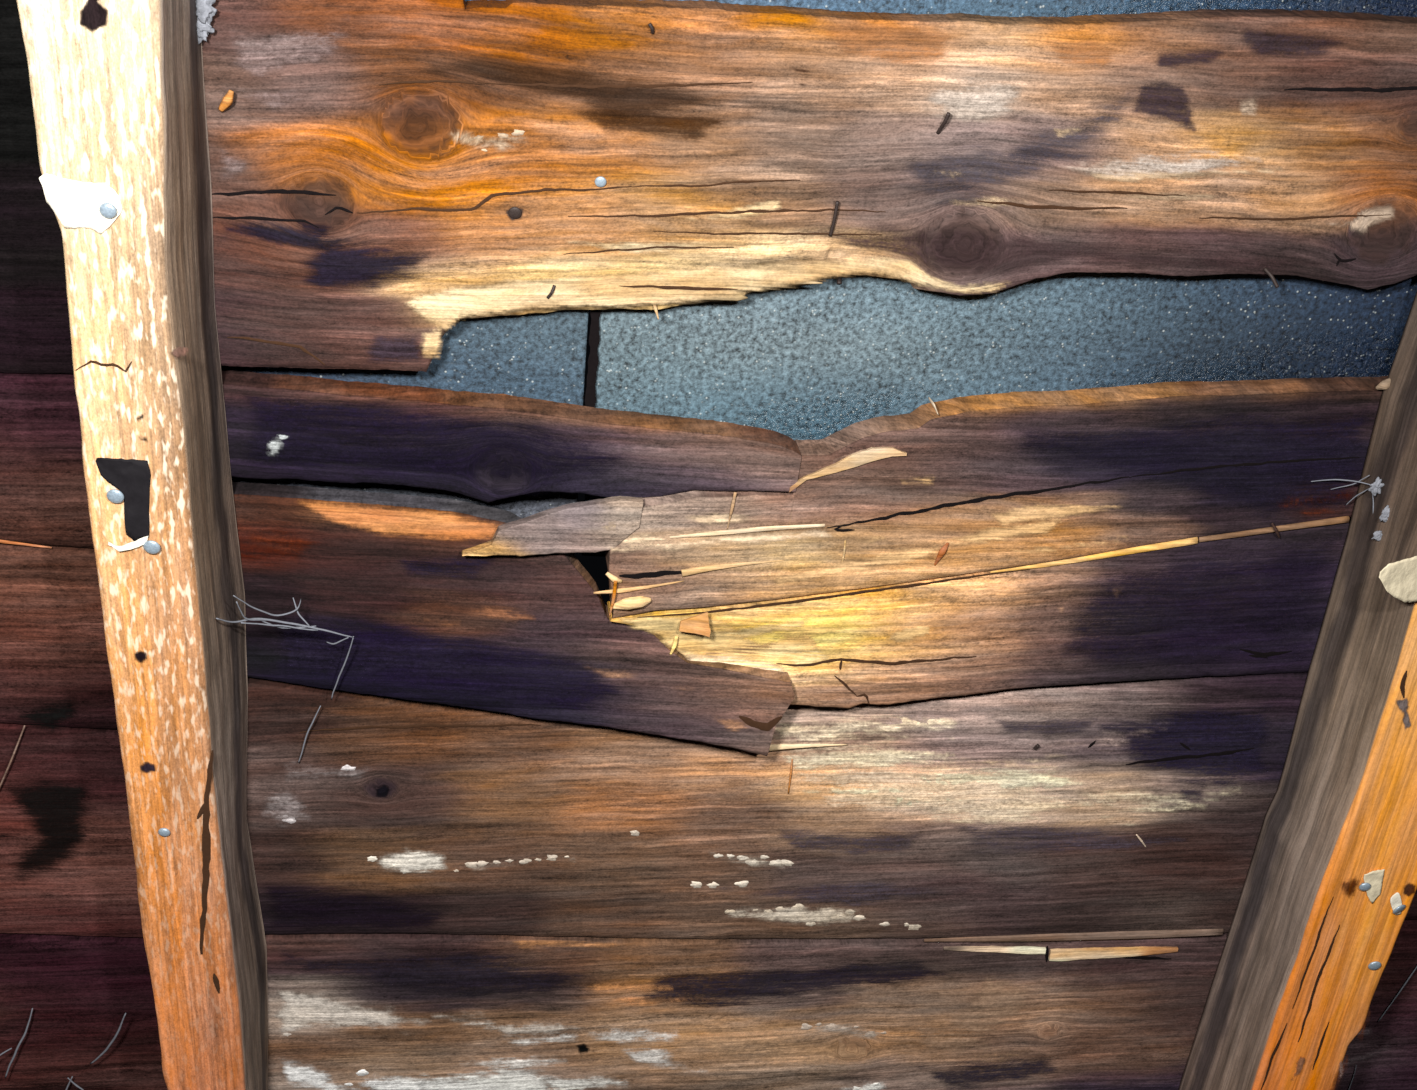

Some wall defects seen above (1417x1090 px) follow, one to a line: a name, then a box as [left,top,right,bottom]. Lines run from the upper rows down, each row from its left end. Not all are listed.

crack [212,179,886,254]
crack [621,283,738,291]
peeling [408,258,1003,355]
crack [827,457,1359,532]
peeling [606,514,828,551]
peeling [774,505,1116,585]
peeling [623,616,841,672]
water stain [367,852,570,874]
water stain [725,883,922,930]
water stain [277,991,401,1037]
crack [1261,898,1340,1090]
water stain [284,1023,621,1090]